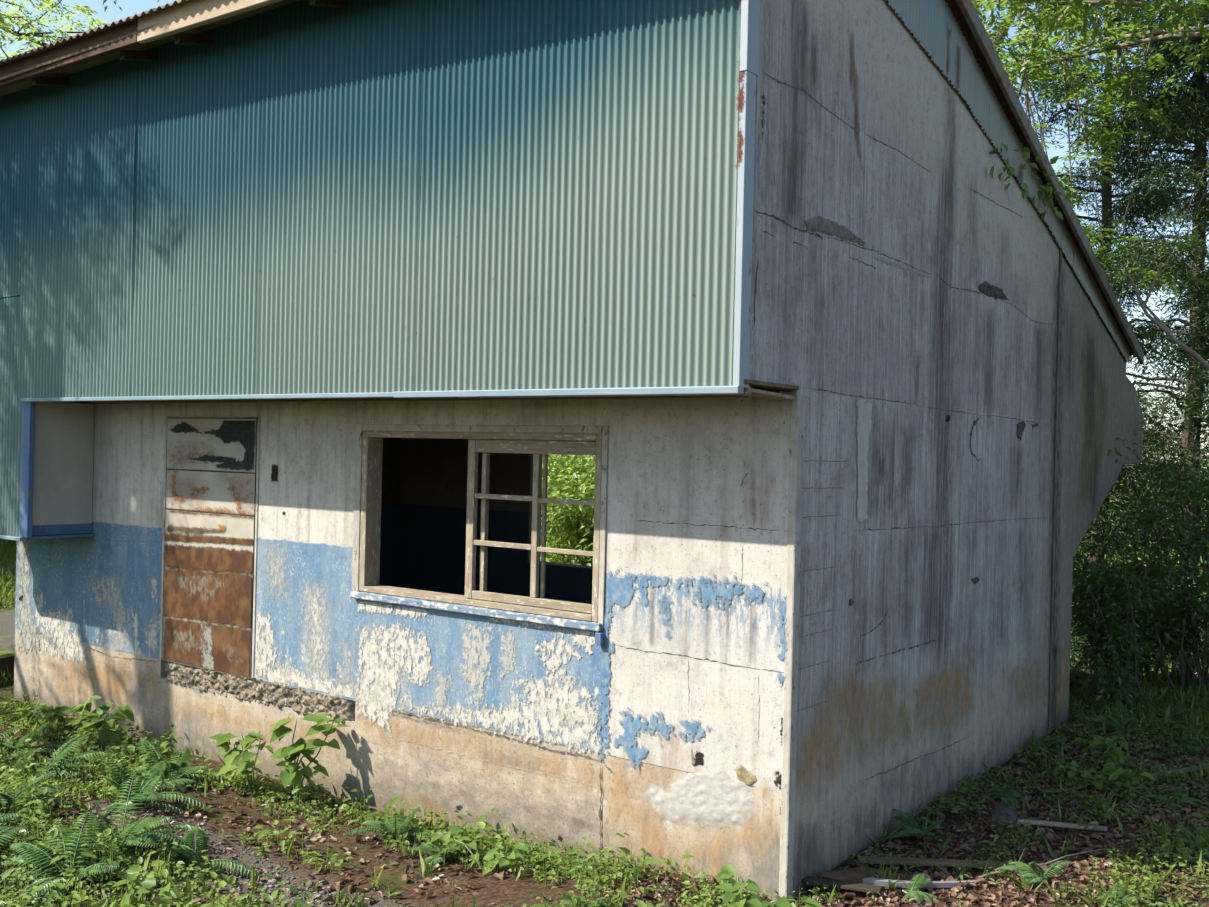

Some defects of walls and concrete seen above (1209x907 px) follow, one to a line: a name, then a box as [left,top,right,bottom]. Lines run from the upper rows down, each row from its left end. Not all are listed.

rust [735,45,747,167]
rust [851,43,865,170]
peeling [170,421,255,471]
peeling [16,539,88,666]
rust [163,473,253,677]
peeling [91,567,789,831]